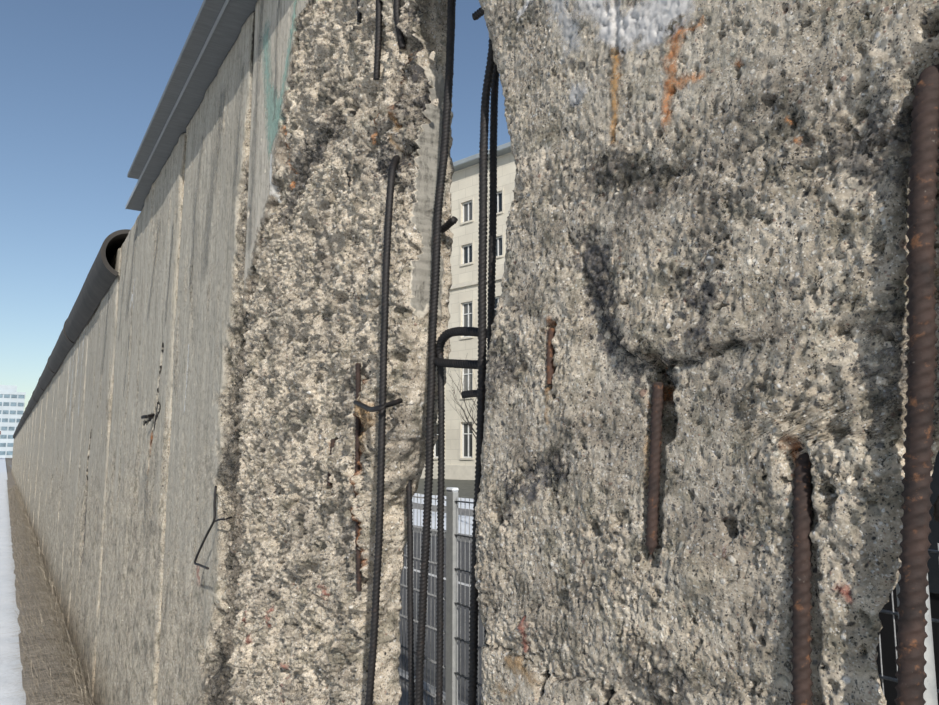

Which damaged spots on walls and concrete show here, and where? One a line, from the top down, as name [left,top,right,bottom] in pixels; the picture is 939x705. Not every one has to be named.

peeling [554,0,701,218]
spalling [202,0,362,705]
spalling [353,0,527,705]
spalling [497,446,570,518]
spalling [546,328,555,385]
spalling [565,222,728,555]
spalling [624,640,700,703]
rust [661,361,674,401]
spalling [791,447,813,705]
spalling [821,64,939,705]